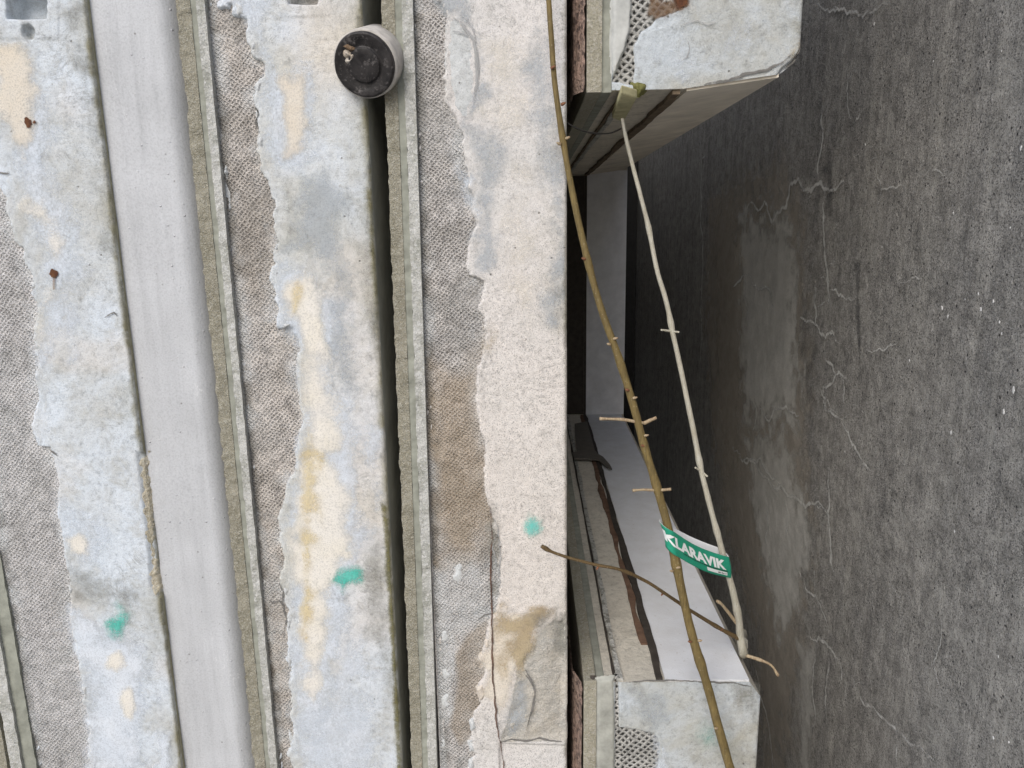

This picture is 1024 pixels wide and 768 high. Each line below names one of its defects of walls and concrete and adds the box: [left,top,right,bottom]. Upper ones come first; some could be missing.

peeling [0,188,91,768]
peeling [207,0,303,768]
damp [279,261,381,768]
peeling [414,0,501,768]
crack [478,505,562,768]
peeling [567,415,659,768]
peeling [611,0,687,85]
crack [705,46,801,85]
crack [739,62,868,469]
crack [733,405,931,760]
crack [813,3,888,28]
crack [874,163,950,225]